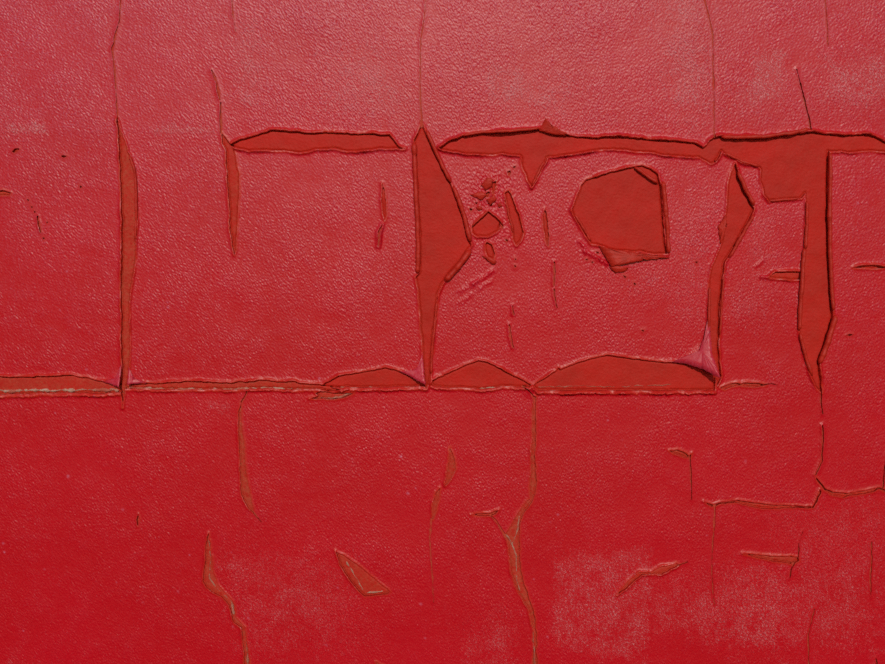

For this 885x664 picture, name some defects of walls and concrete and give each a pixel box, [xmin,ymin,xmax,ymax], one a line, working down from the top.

peeling [102,0,146,415]
peeling [208,0,885,407]
crack [0,368,345,526]
crack [198,529,255,664]
peeling [330,545,396,601]
crack [467,385,542,664]
crack [612,391,885,608]
crack [717,376,781,397]